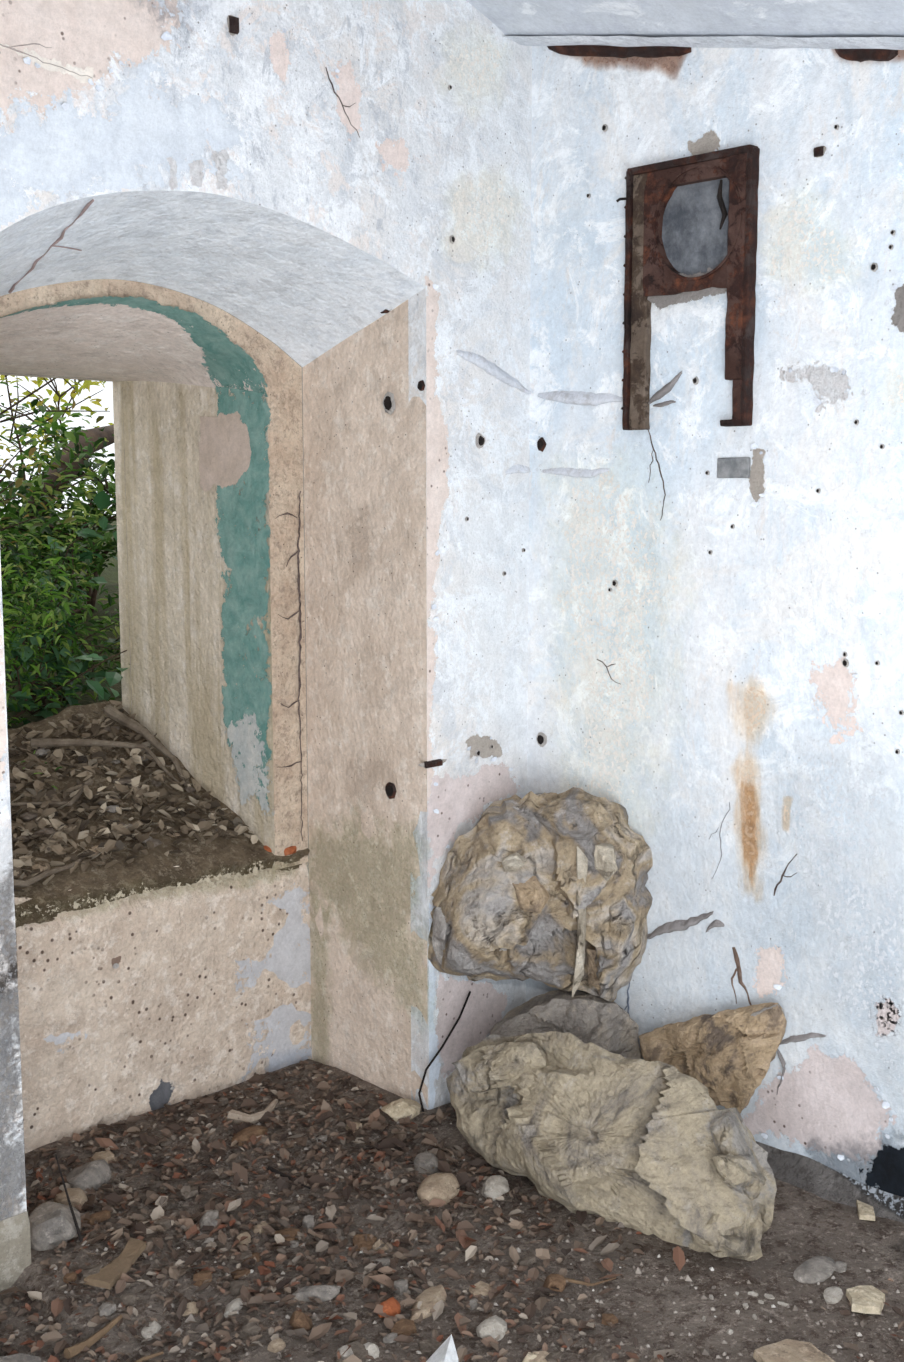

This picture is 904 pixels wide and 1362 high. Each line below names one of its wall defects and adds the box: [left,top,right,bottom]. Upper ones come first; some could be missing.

corrosion [547,45,691,71]
peeling [0,0,258,229]
crack [325,67,360,138]
crack [8,199,94,294]
spalling [890,284,904,333]
leakage [808,1139,904,1216]